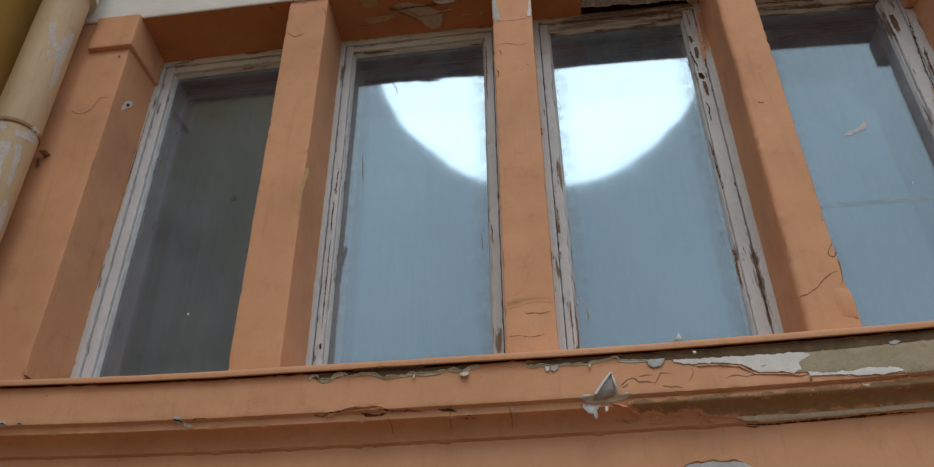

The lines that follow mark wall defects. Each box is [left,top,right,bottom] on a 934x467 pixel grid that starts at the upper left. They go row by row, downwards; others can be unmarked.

peeling [354,0,531,29]
spalling [581,0,697,14]
peeling [889,12,934,95]
crack [792,242,843,299]
peeling [308,364,480,383]
flaking render [524,331,934,430]
crack [314,399,475,435]